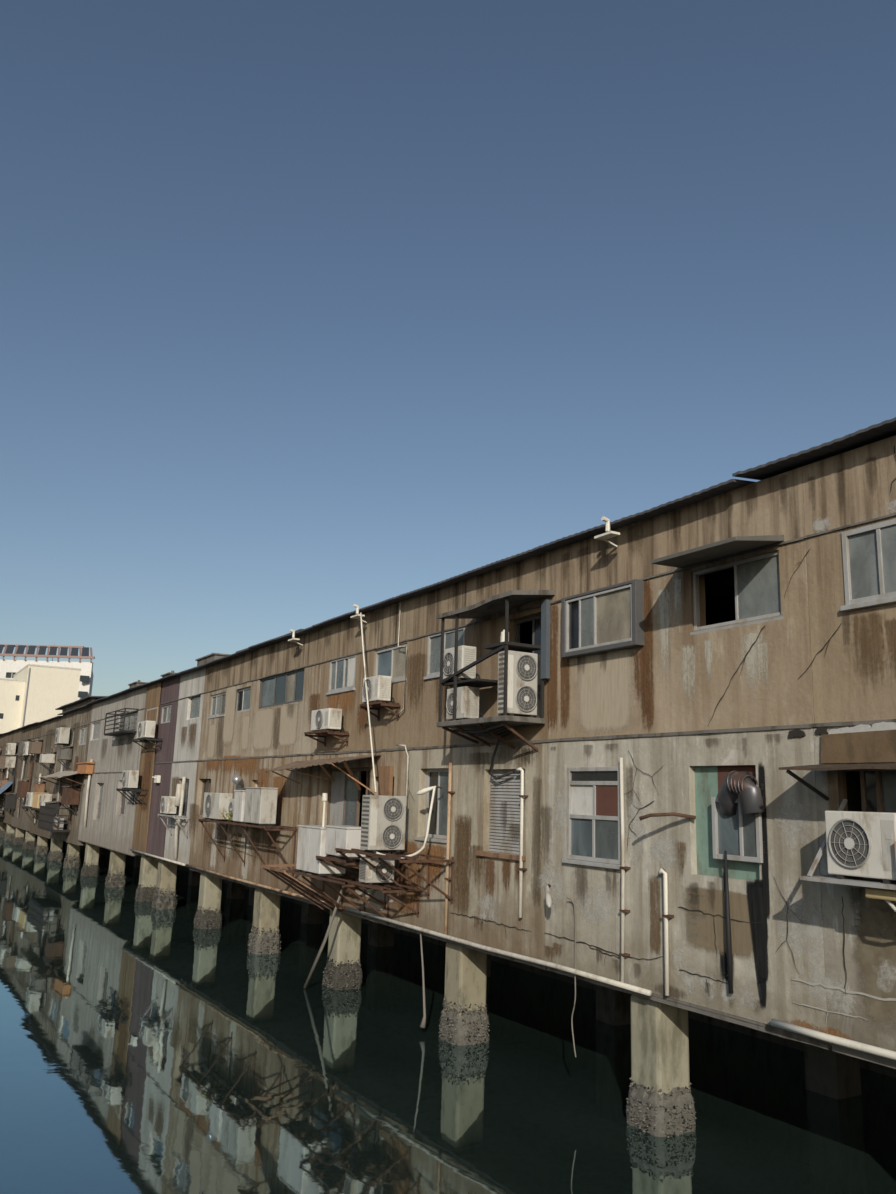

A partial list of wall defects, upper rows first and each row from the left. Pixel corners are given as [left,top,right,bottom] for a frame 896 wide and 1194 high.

rust [634,580,654,728]
crack [707,626,765,727]
crack [798,623,842,679]
spalling [788,722,896,738]
rust [395,817,483,915]